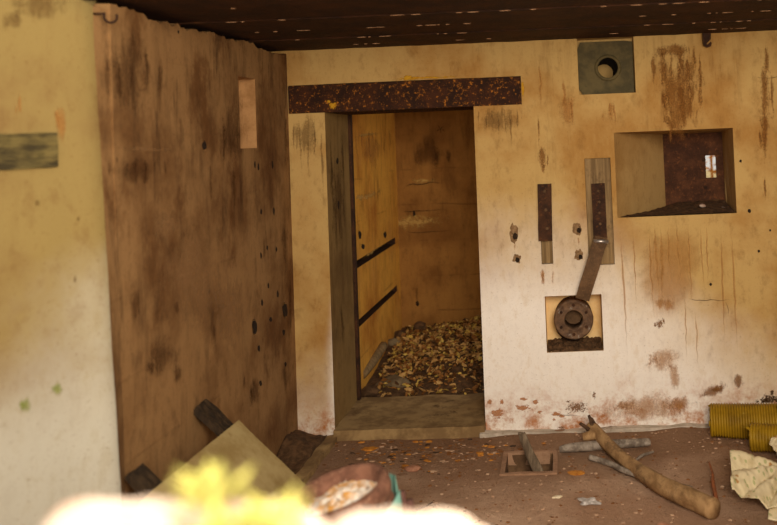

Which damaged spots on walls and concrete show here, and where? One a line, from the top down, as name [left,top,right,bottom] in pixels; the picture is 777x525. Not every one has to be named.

rust [651,45,702,141]
rust [759,49,774,147]
peeling [552,392,596,429]
mould [755,390,777,403]